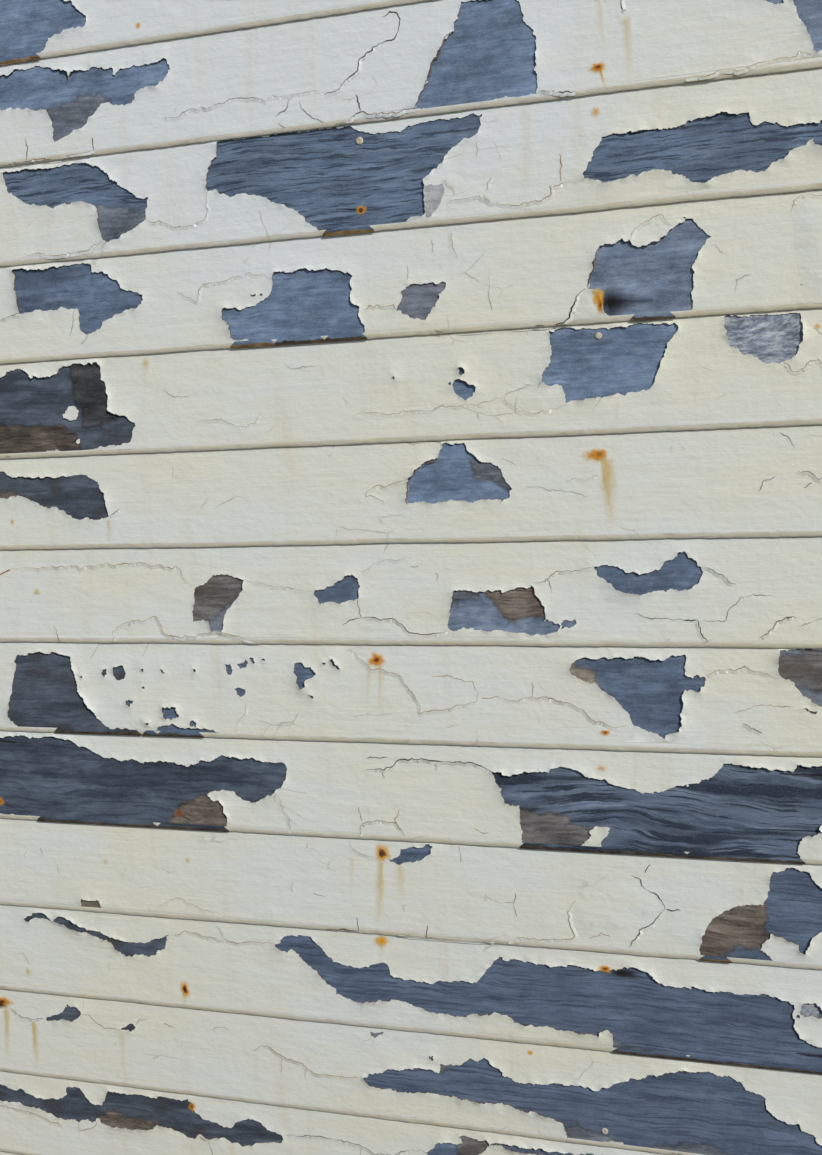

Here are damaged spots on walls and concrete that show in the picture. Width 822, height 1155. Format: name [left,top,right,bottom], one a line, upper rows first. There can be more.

crack [162,11,415,128]
peeling [206,0,538,237]
peeling [583,112,822,183]
peeling [542,217,711,403]
peeling [0,362,136,454]
rust [591,450,610,495]
peeling [0,652,287,832]
rust [377,847,388,879]
crack [398,865,681,949]
peeling [492,763,822,964]
peeling [275,935,822,1155]
peeling [0,1084,283,1147]